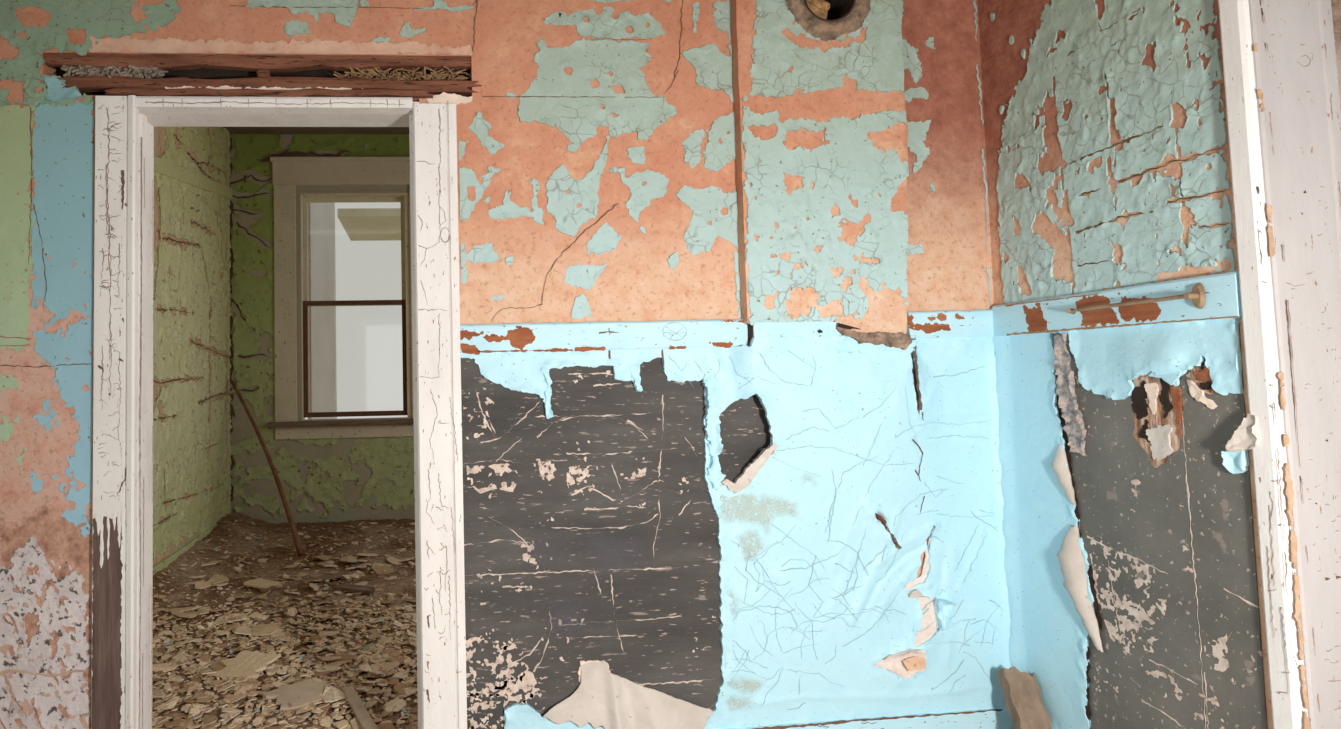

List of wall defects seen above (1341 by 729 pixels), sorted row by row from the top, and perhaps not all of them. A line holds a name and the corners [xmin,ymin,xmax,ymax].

peeling [426,0,965,334]
peeling [996,0,1236,332]
crack [1269,83,1333,154]
peeling [0,0,474,729]
peeling [467,463,517,499]
peeling [566,441,599,510]
peeling [620,451,689,494]
crack [669,350,1003,729]
peeling [1090,537,1182,701]
flaking render [1131,359,1218,468]
crack [1069,126,1341,718]
peeling [1194,693,1224,729]